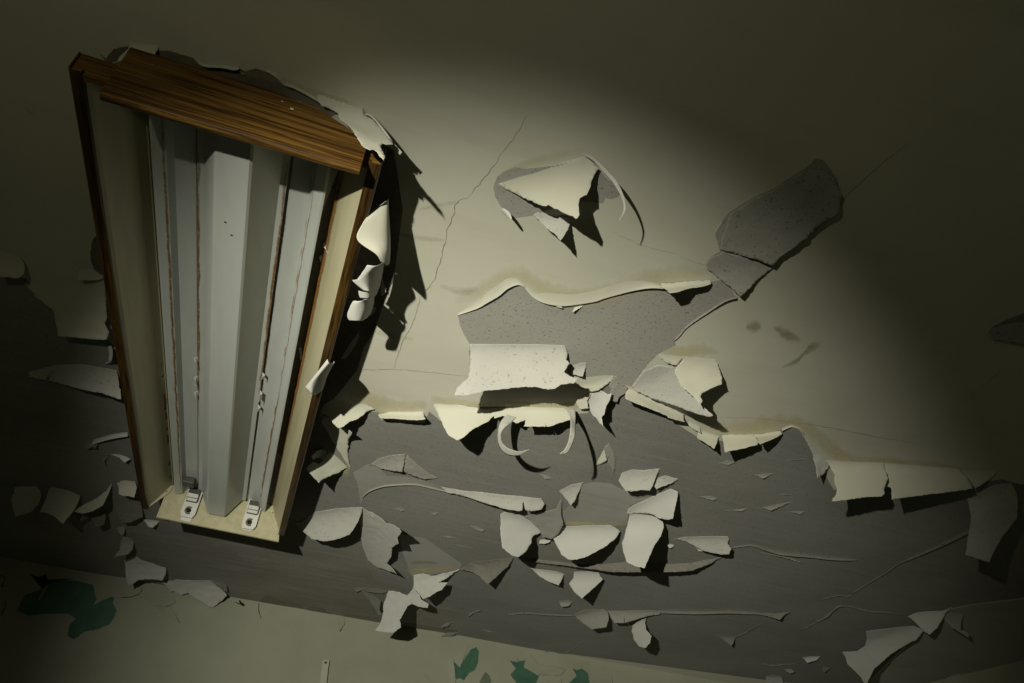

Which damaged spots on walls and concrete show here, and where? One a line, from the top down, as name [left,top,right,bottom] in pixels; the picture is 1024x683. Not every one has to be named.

peeling [100,42,403,422]
peeling [267,169,340,506]
crack [347,117,526,375]
flaking render [0,251,1024,683]
peeling [455,154,842,426]